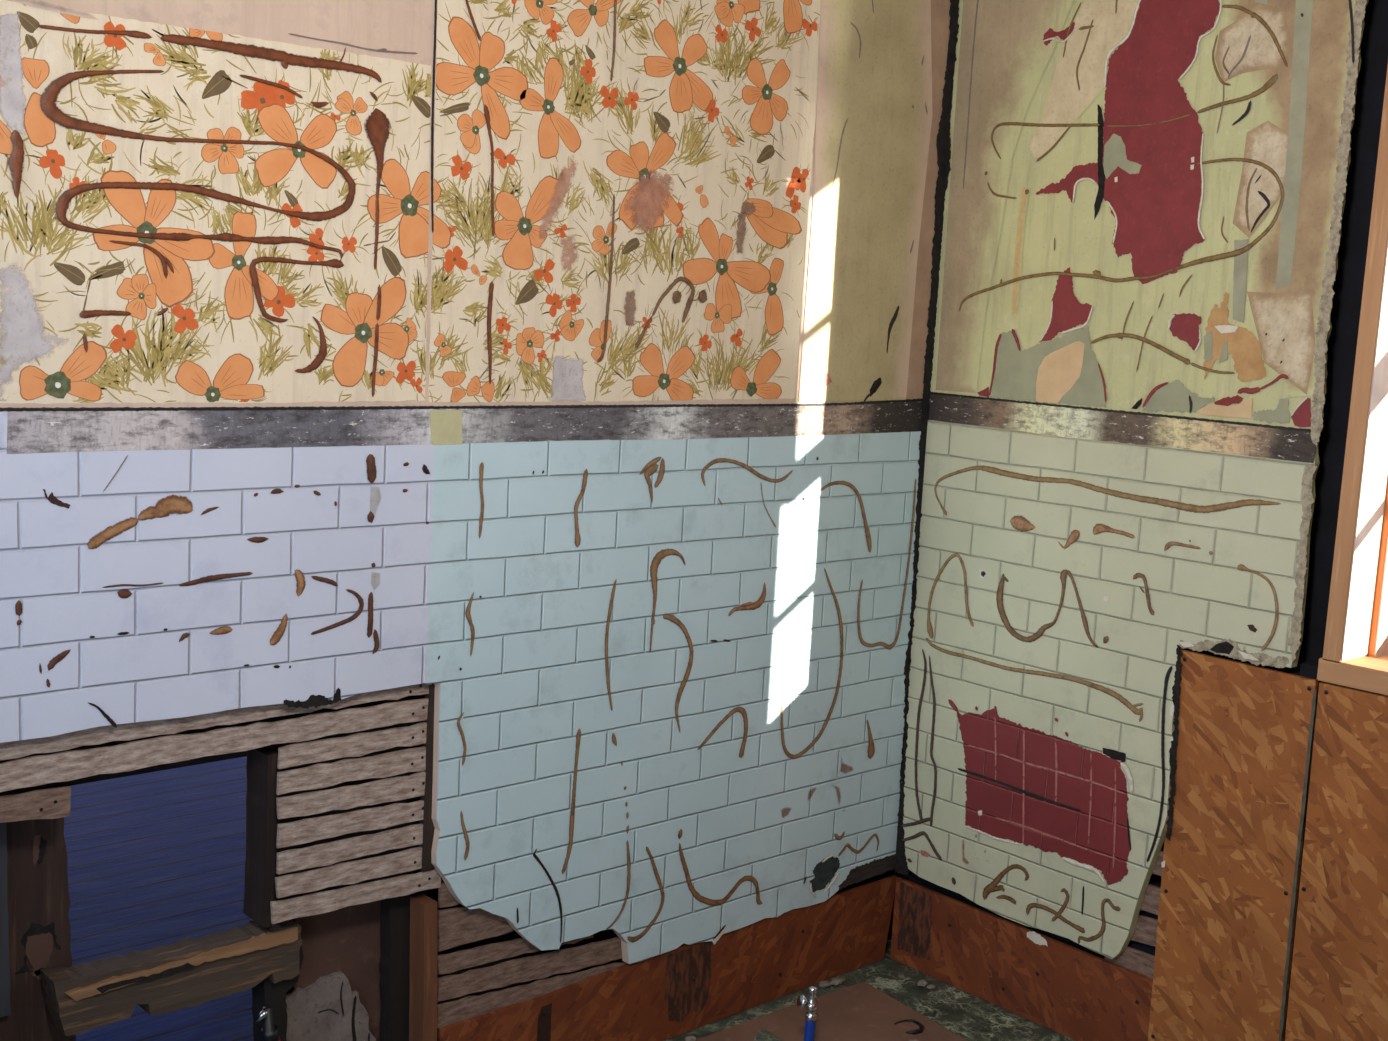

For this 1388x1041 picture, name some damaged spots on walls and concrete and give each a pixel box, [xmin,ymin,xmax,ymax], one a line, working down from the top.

peeling [936,0,1367,447]
spalling [863,377,882,405]
crack [103,455,128,492]
crack [760,483,776,527]
spalling [1165,465,1317,841]
crack [87,702,117,728]
spalling [284,688,342,709]
crack [1147,666,1172,862]
peeling [948,699,1134,885]
crack [533,849,562,943]
spalling [803,854,896,898]
crack [1078,886,1086,915]